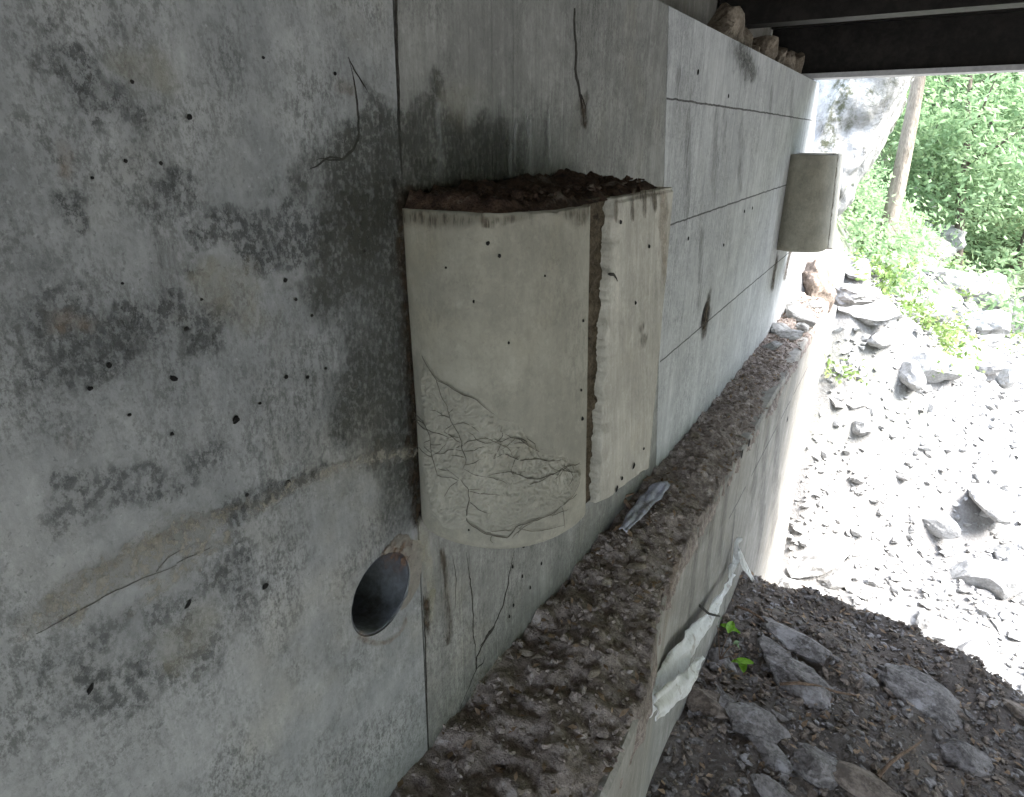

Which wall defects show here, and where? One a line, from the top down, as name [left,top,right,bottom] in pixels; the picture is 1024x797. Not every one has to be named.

water stain [51,43,147,125]
crack [310,57,368,169]
crack [573,8,585,122]
water stain [22,71,527,644]
crack [413,357,580,708]
crack [36,548,209,634]
water stain [74,630,148,715]